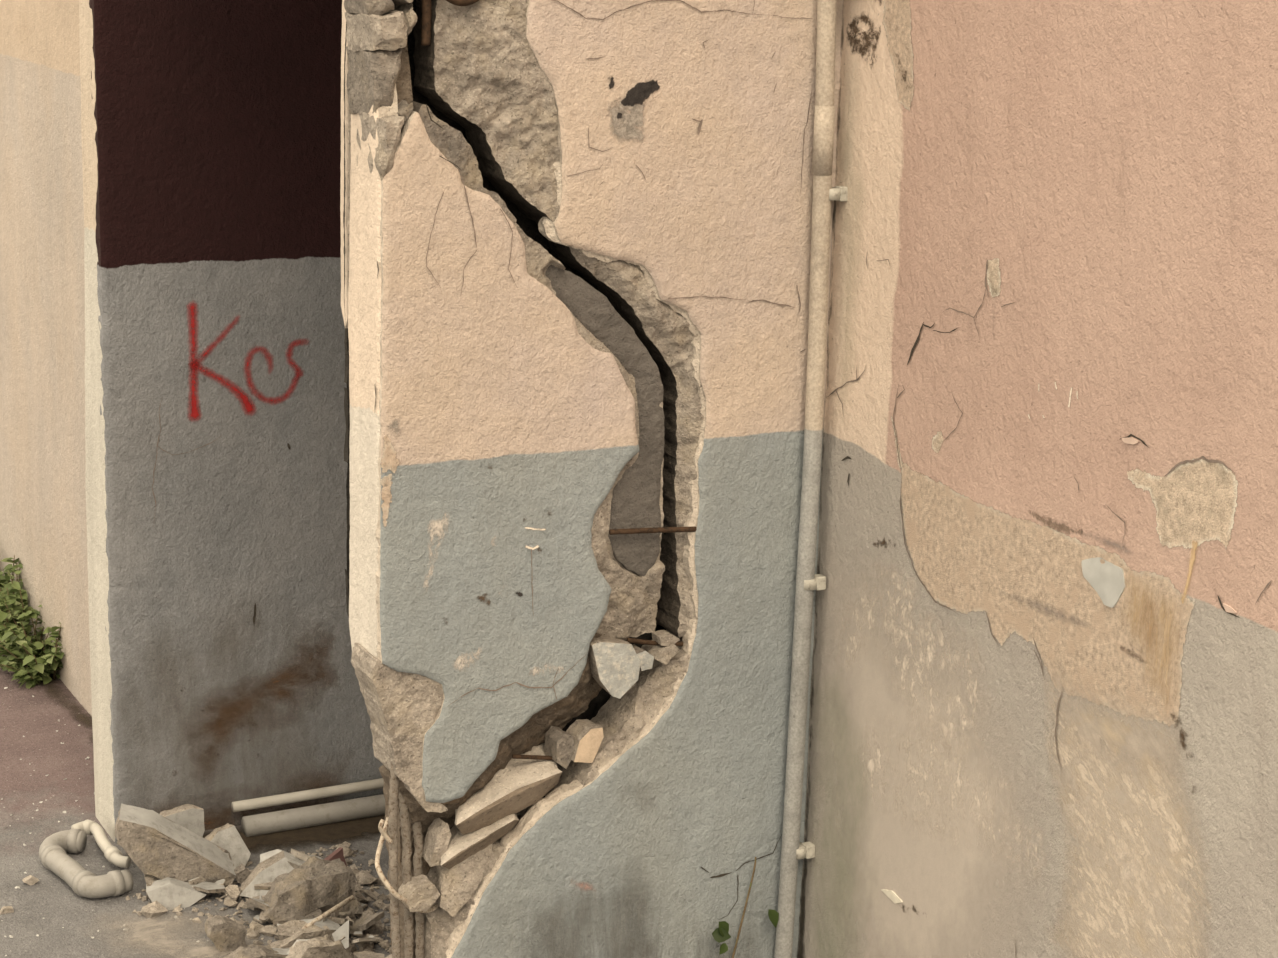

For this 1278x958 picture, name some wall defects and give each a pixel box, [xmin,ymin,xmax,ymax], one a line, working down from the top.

crack [407,0,611,303]
crack [570,128,646,186]
crack [668,286,801,312]
crack [829,365,866,416]
crack [893,283,1015,469]
spalling [344,0,704,958]
crack [625,623,666,648]
corrosion [205,666,307,754]
crack [447,649,611,732]
peeling [840,416,1240,958]